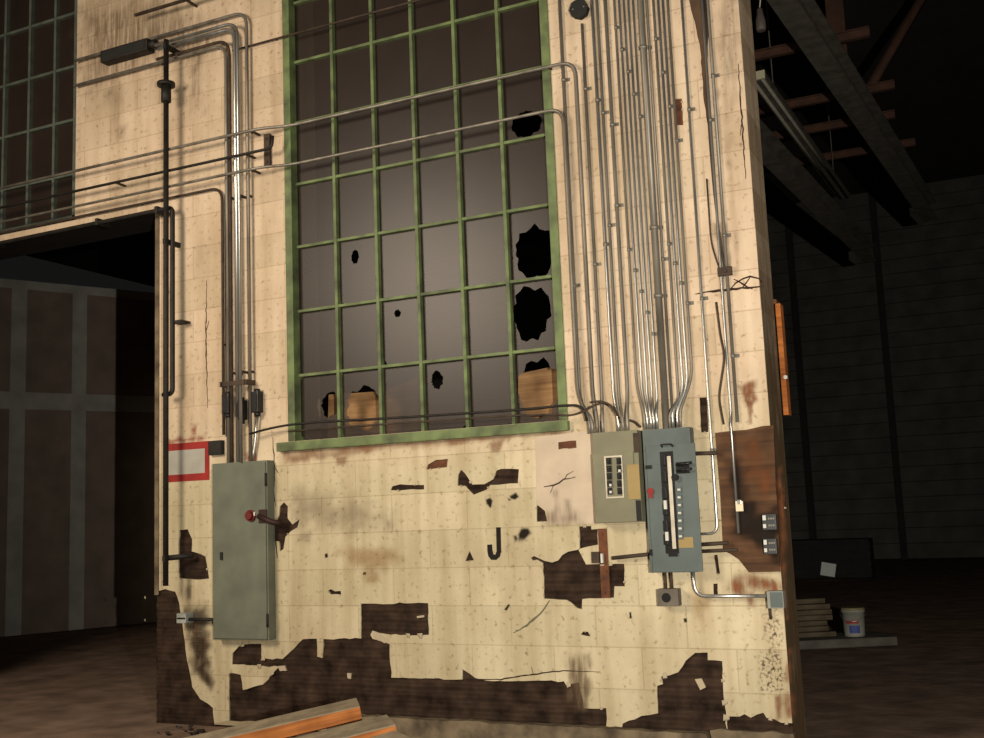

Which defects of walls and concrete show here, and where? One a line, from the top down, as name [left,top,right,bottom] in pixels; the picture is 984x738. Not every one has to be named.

spalling [427,459,448,470]
spalling [458,469,519,494]
crack [544,471,575,493]
spalling [179,529,209,580]
spalling [275,503,299,550]
spalling [532,524,626,609]
corrosion [733,317,807,738]
spalling [144,589,217,726]
water stain [188,611,210,684]
spalling [227,603,607,726]
crack [513,600,550,633]
spalling [623,652,793,736]